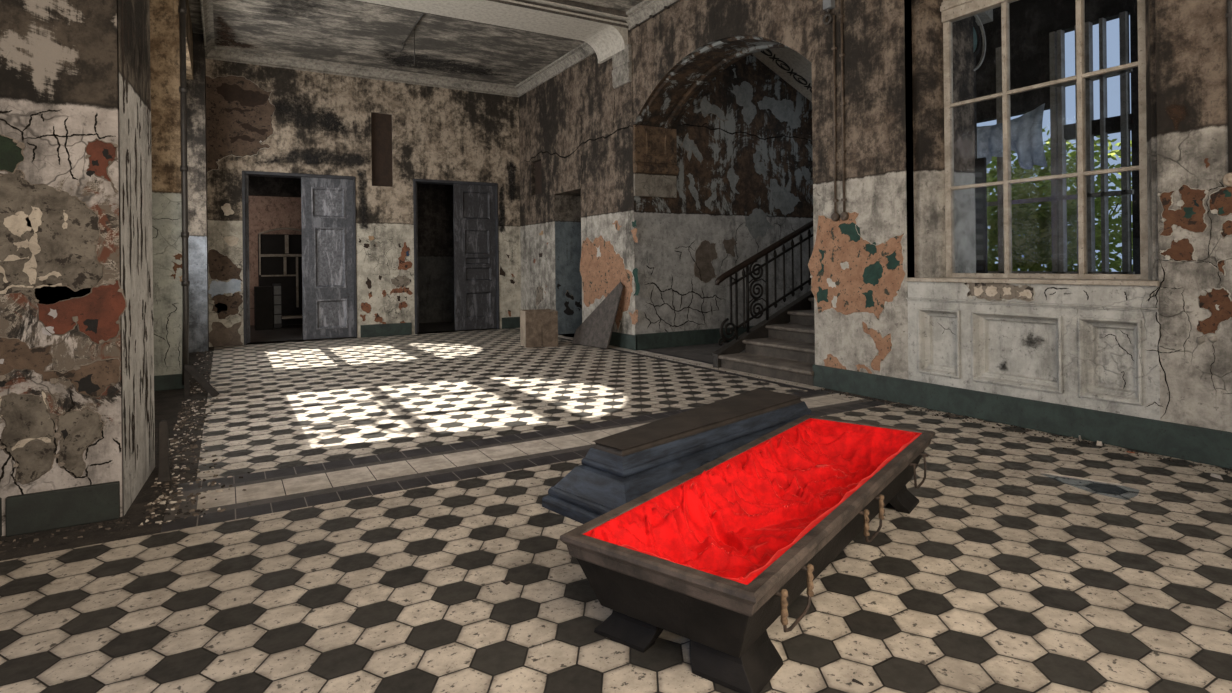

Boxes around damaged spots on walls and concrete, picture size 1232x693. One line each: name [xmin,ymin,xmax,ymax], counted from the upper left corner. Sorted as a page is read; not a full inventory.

water stain [375,50,501,75]
crack [0,109,113,180]
crack [526,93,639,200]
peeling [0,0,155,515]
spalling [208,235,243,347]
peeling [535,220,640,330]
crack [645,223,795,332]
peeling [807,212,907,374]
crack [1044,287,1089,300]
crack [1101,182,1232,418]
peeling [1157,184,1232,262]
peeling [1196,260,1232,335]